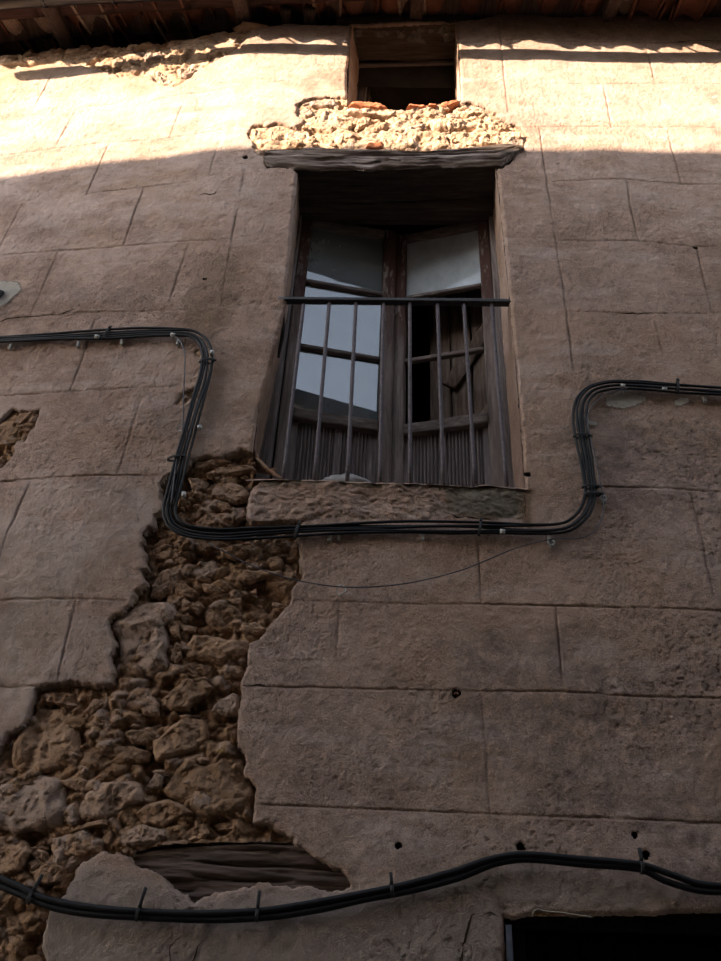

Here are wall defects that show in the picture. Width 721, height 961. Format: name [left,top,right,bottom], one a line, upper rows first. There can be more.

spalling [0,31,250,87]
spalling [248,97,529,157]
spalling [0,410,40,469]
spalling [0,450,302,898]
spalling [0,890,50,961]
crack [459,912,497,961]